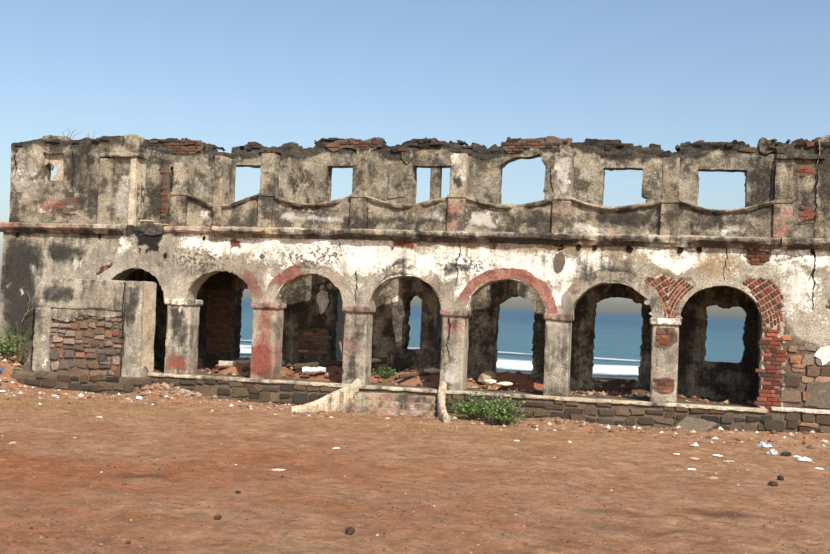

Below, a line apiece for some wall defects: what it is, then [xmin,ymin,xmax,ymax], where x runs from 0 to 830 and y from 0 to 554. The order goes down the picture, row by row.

efflorescence [281,213,341,222]
water stain [470,213,499,228]
crack [802,169,826,310]
water stain [50,245,84,261]
flaking render [743,249,772,265]
water stain [6,240,74,334]
flaking render [511,274,830,433]
peeling [443,370,459,384]
flaking render [434,392,500,417]